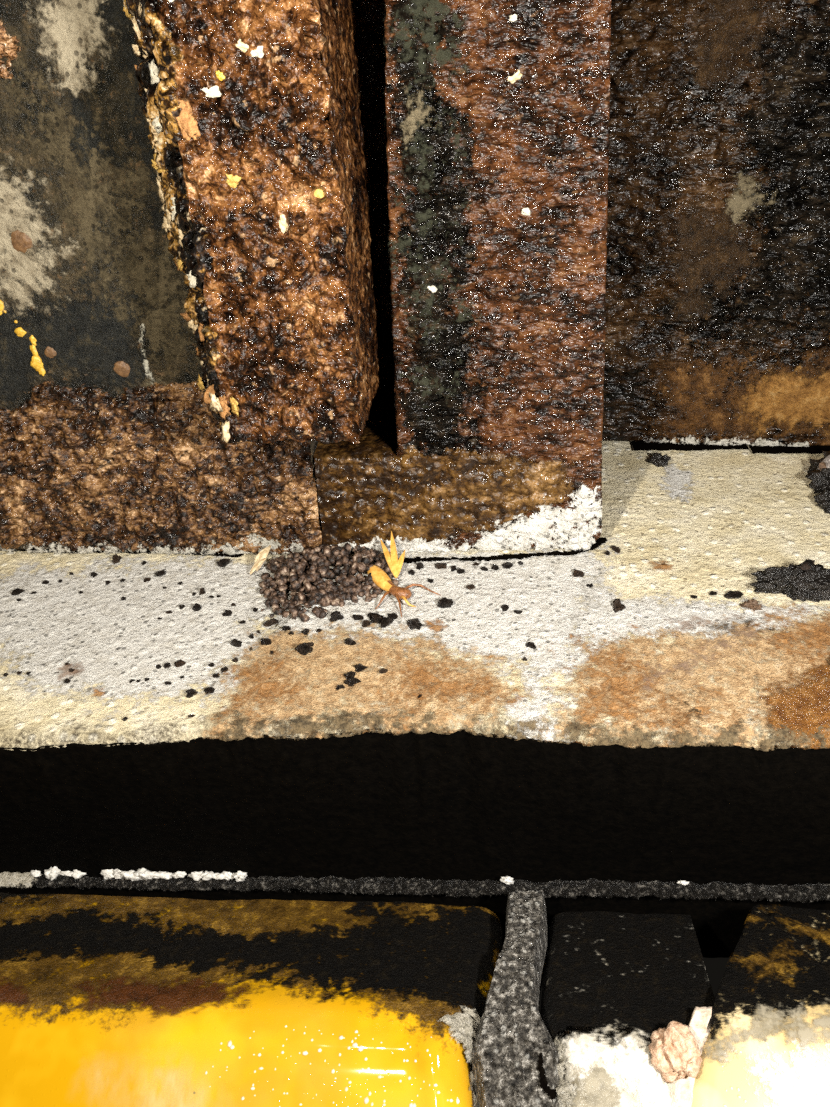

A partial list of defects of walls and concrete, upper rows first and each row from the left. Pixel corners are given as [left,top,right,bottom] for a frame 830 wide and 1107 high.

water stain [59,0,162,254]
water stain [649,0,830,365]
corrosion [123,0,575,550]
water stain [0,272,159,401]
water stain [644,435,809,447]
corrosion [645,332,830,445]
corrosion [203,620,531,740]
corrosion [547,603,830,749]
water stain [0,866,86,909]
water stain [100,868,248,882]
water stain [344,901,425,937]
water stain [566,1067,624,1107]